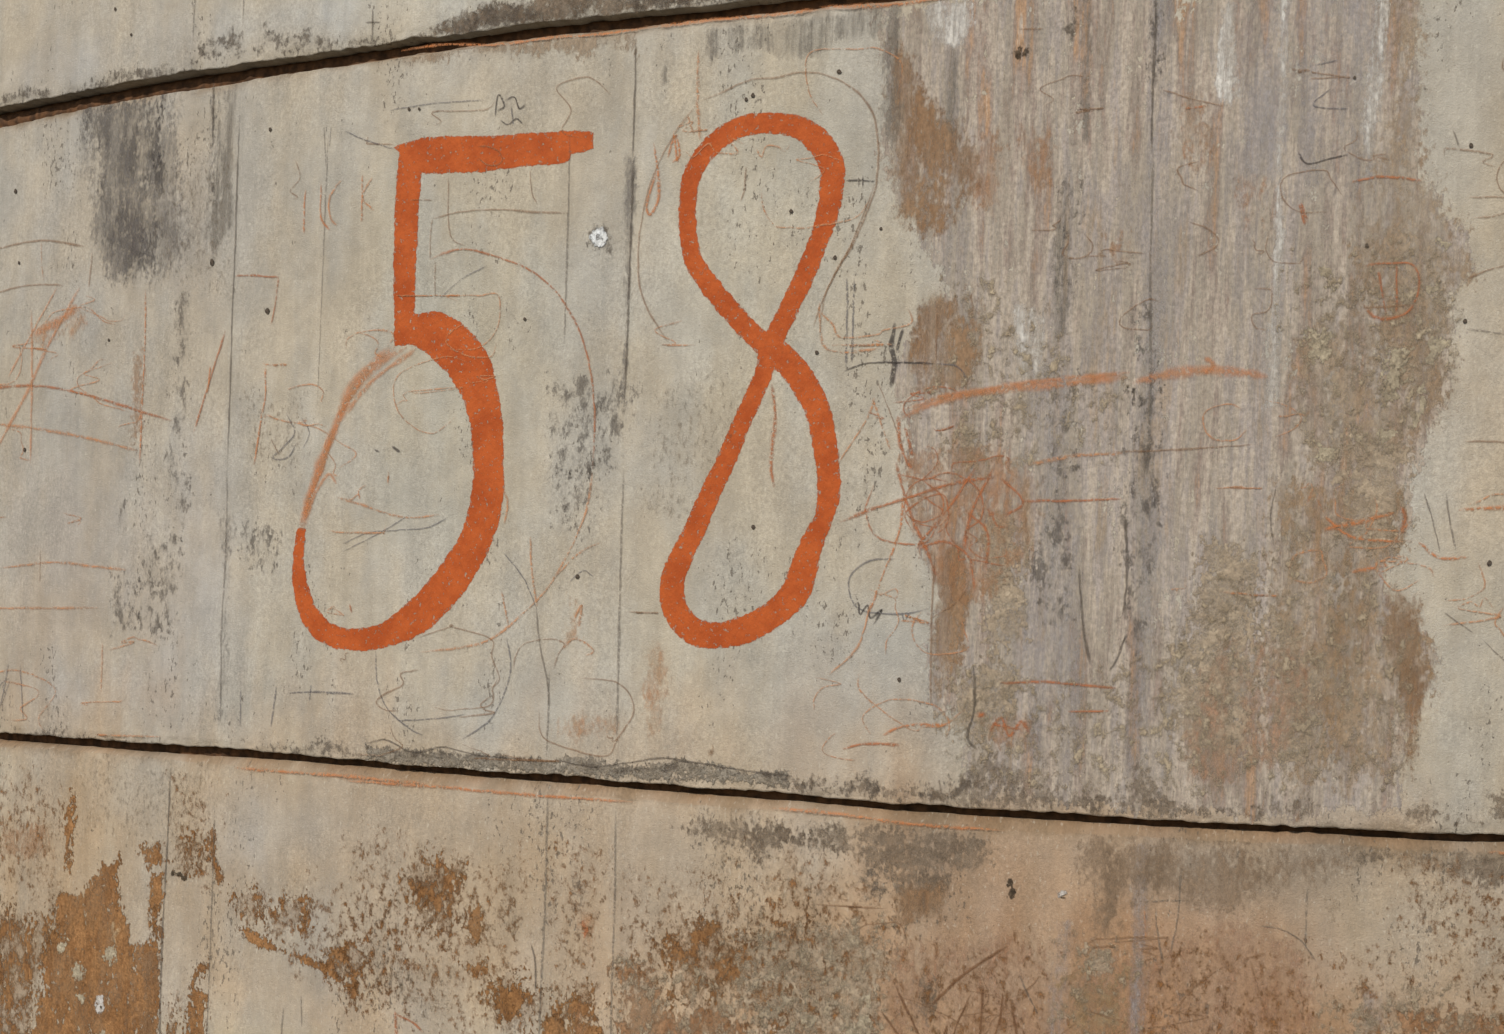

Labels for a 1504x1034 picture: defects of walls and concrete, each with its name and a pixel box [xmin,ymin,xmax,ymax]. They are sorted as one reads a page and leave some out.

damp [413,0,739,64]
damp [82,94,182,279]
damp [841,751,1313,818]
corrosion [397,844,488,952]
corrosion [1349,1003,1504,1034]